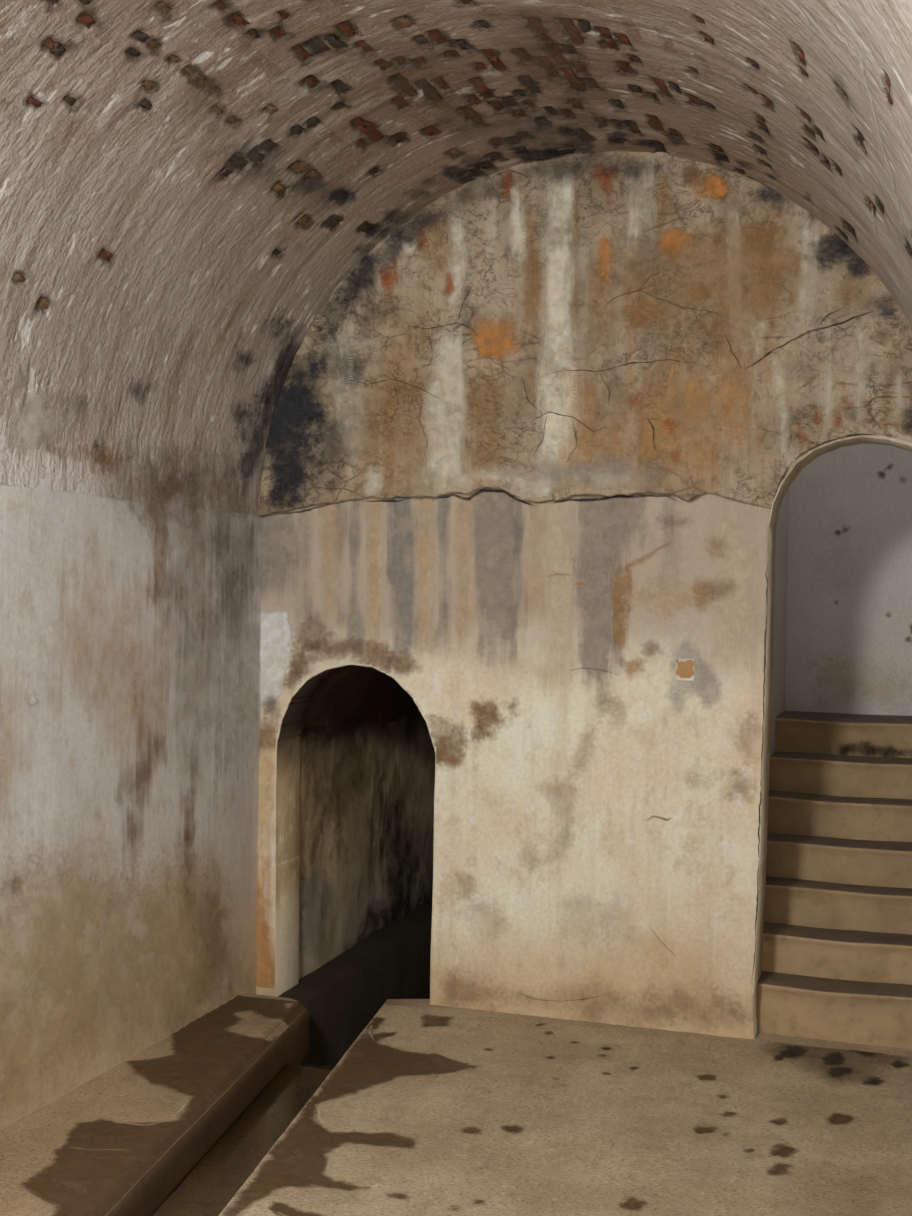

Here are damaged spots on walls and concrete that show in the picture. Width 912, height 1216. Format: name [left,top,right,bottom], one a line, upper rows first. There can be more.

spalling [41,38,74,59]
spalling [76,0,102,29]
spalling [125,30,242,128]
damp [130,202,433,675]
damp [311,336,520,670]
crack [411,288,697,464]
crack [439,489,676,505]
flaking render [209,0,912,517]
crack [605,273,872,368]
crack [775,434,871,493]
damp [0,869,306,1216]
damp [225,1017,476,1216]